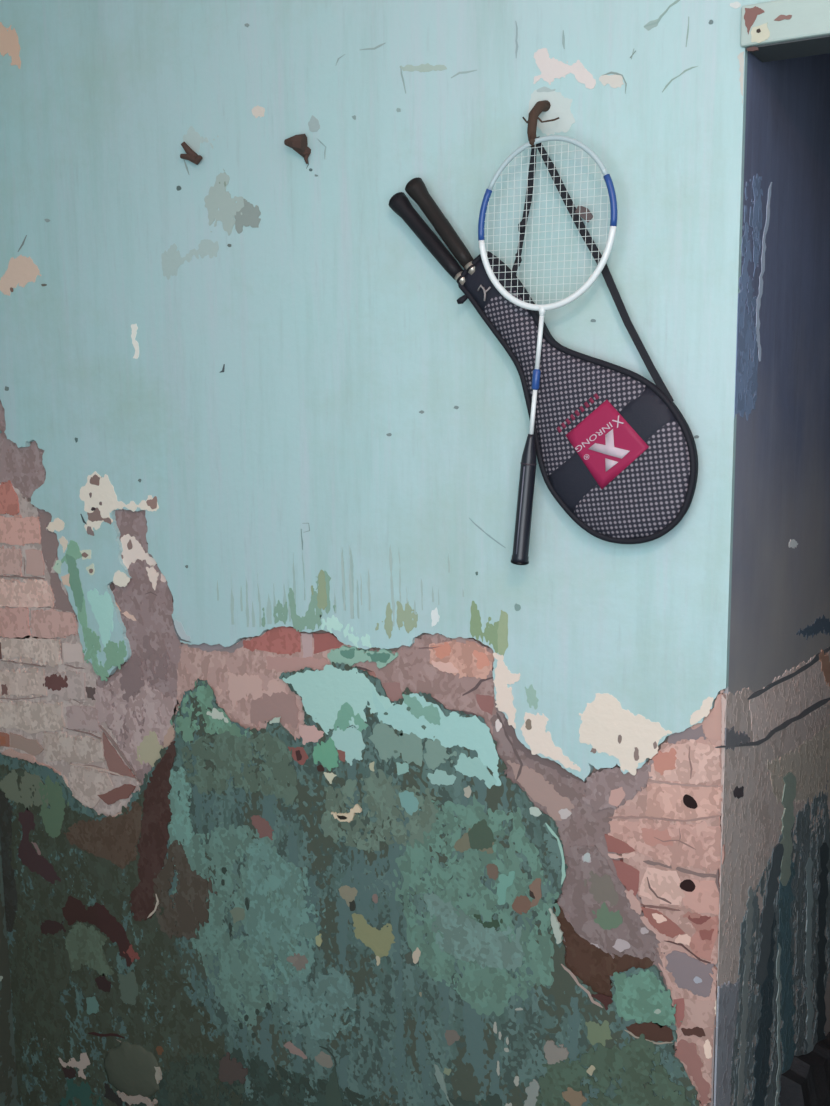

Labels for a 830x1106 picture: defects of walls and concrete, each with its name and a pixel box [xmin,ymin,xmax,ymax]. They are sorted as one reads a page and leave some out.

peeling [0,22,21,69]
peeling [528,48,624,136]
peeling [0,255,41,296]
crack [748,647,830,700]
peeling [0,402,830,1106]
damp [724,726,750,751]
crack [647,698,830,787]
damp [0,540,705,1106]
crack [609,815,720,911]
crack [666,941,711,963]